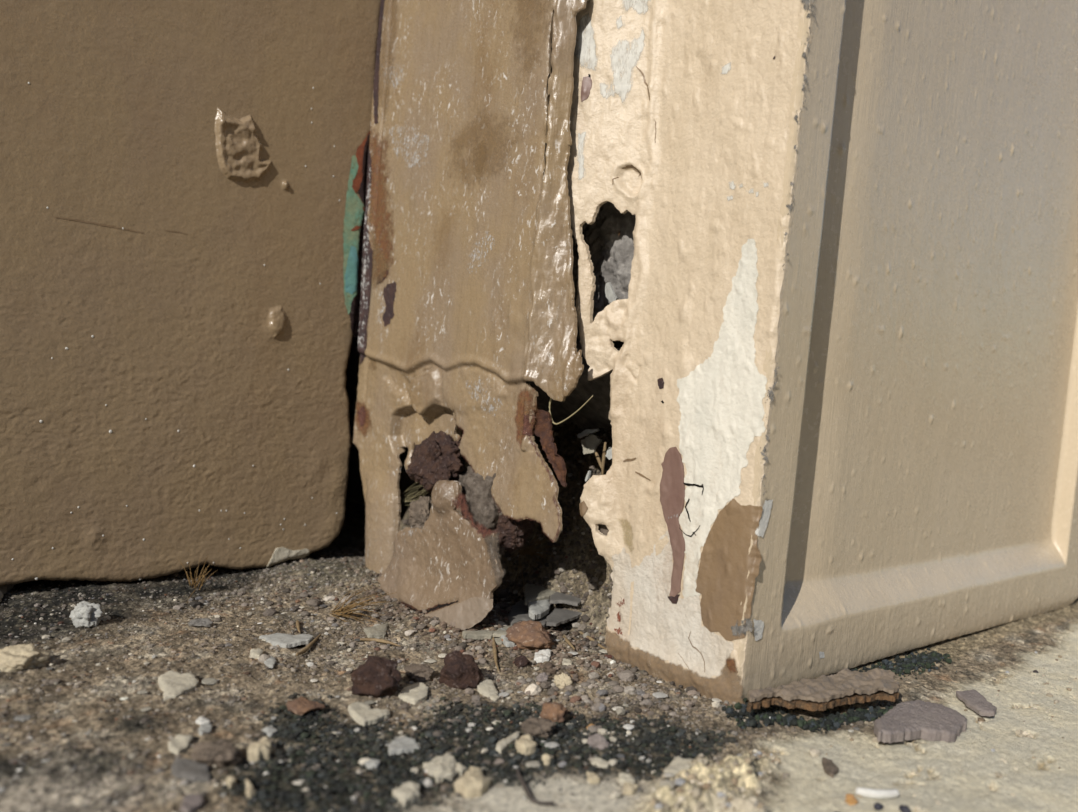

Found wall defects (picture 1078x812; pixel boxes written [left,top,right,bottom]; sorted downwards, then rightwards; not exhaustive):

peeling [575,14,597,70]
peeling [600,0,648,102]
hole [583,203,636,321]
peeling [581,434,612,460]
peeling [607,239,767,679]
spalling [755,500,773,537]
peeling [549,592,581,606]